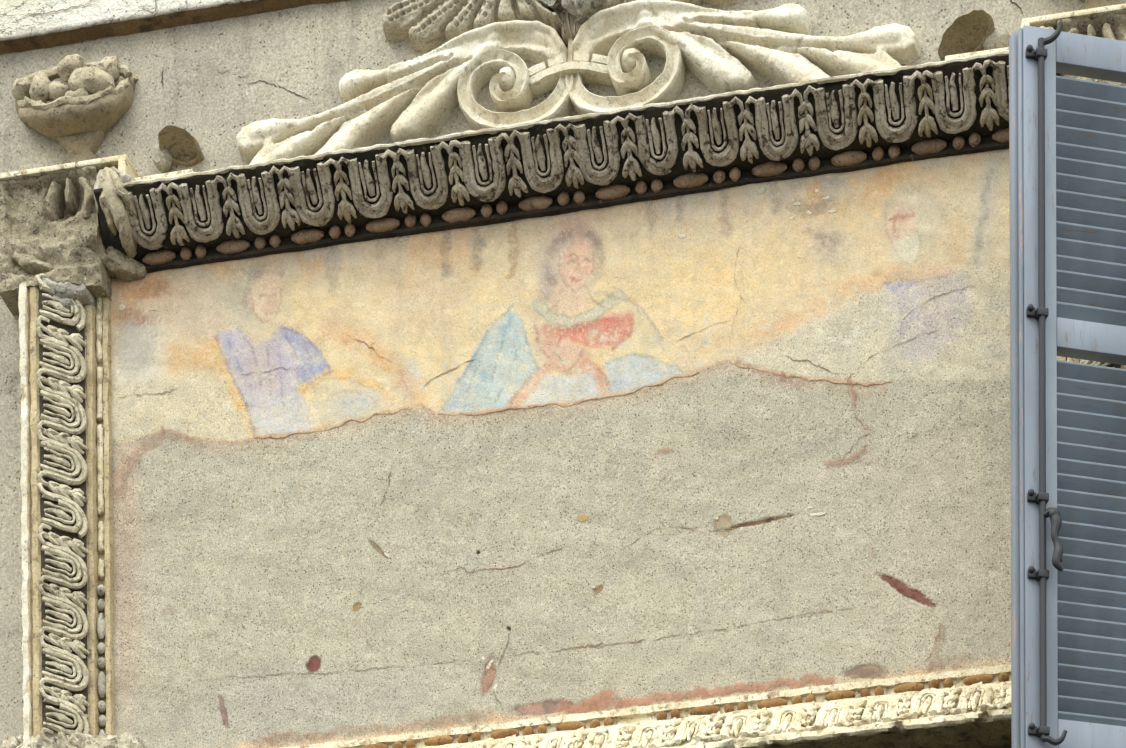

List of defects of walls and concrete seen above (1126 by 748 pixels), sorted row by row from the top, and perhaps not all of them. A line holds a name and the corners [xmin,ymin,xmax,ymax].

crack [217,69,310,100]
crack [783,286,974,391]
peeling [735,363,893,387]
peeling [438,371,699,416]
peeling [255,406,421,439]
spalling [715,514,794,537]
crack [449,546,565,580]
spalling [881,572,937,606]
spalling [306,655,321,672]
spalling [480,656,498,693]
spalling [844,664,886,678]
spalling [516,698,573,715]